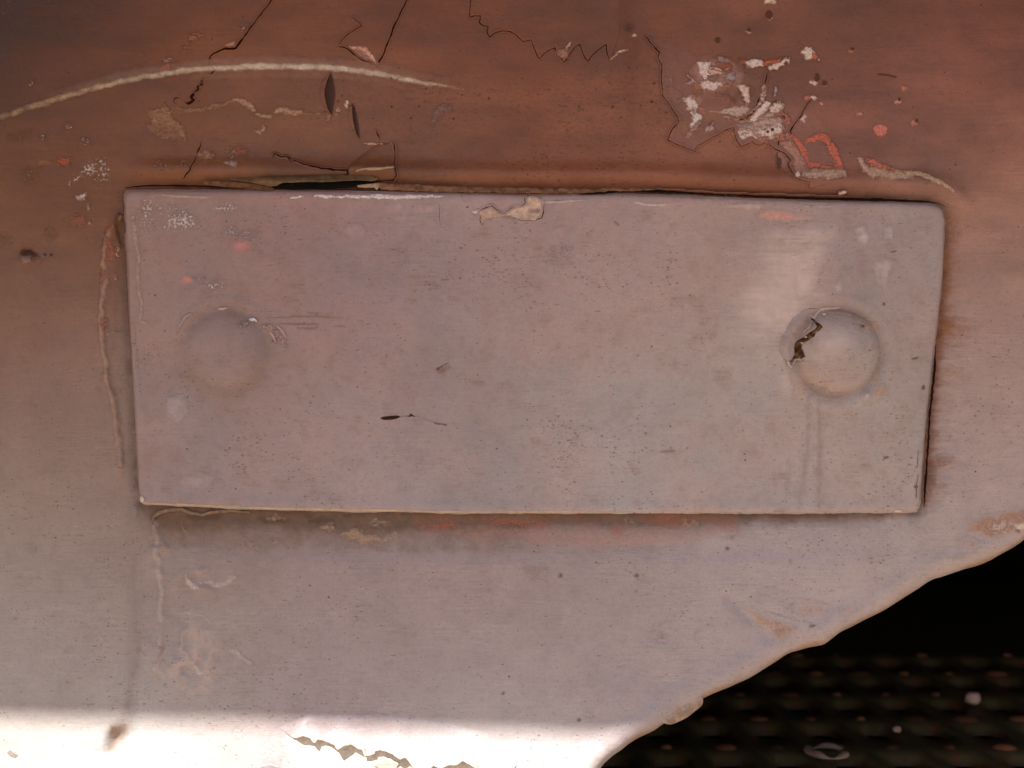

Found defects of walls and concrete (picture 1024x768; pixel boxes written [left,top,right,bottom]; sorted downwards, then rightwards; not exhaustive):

crack [171,0,274,107]
crack [320,0,409,142]
crack [467,0,628,65]
peeling [643,34,955,192]
crack [125,140,233,188]
crack [271,152,349,175]
peeling [137,140,670,240]
crack [578,187,945,207]
peeling [702,202,897,399]
corrosion [403,513,755,554]
peeling [258,711,517,768]